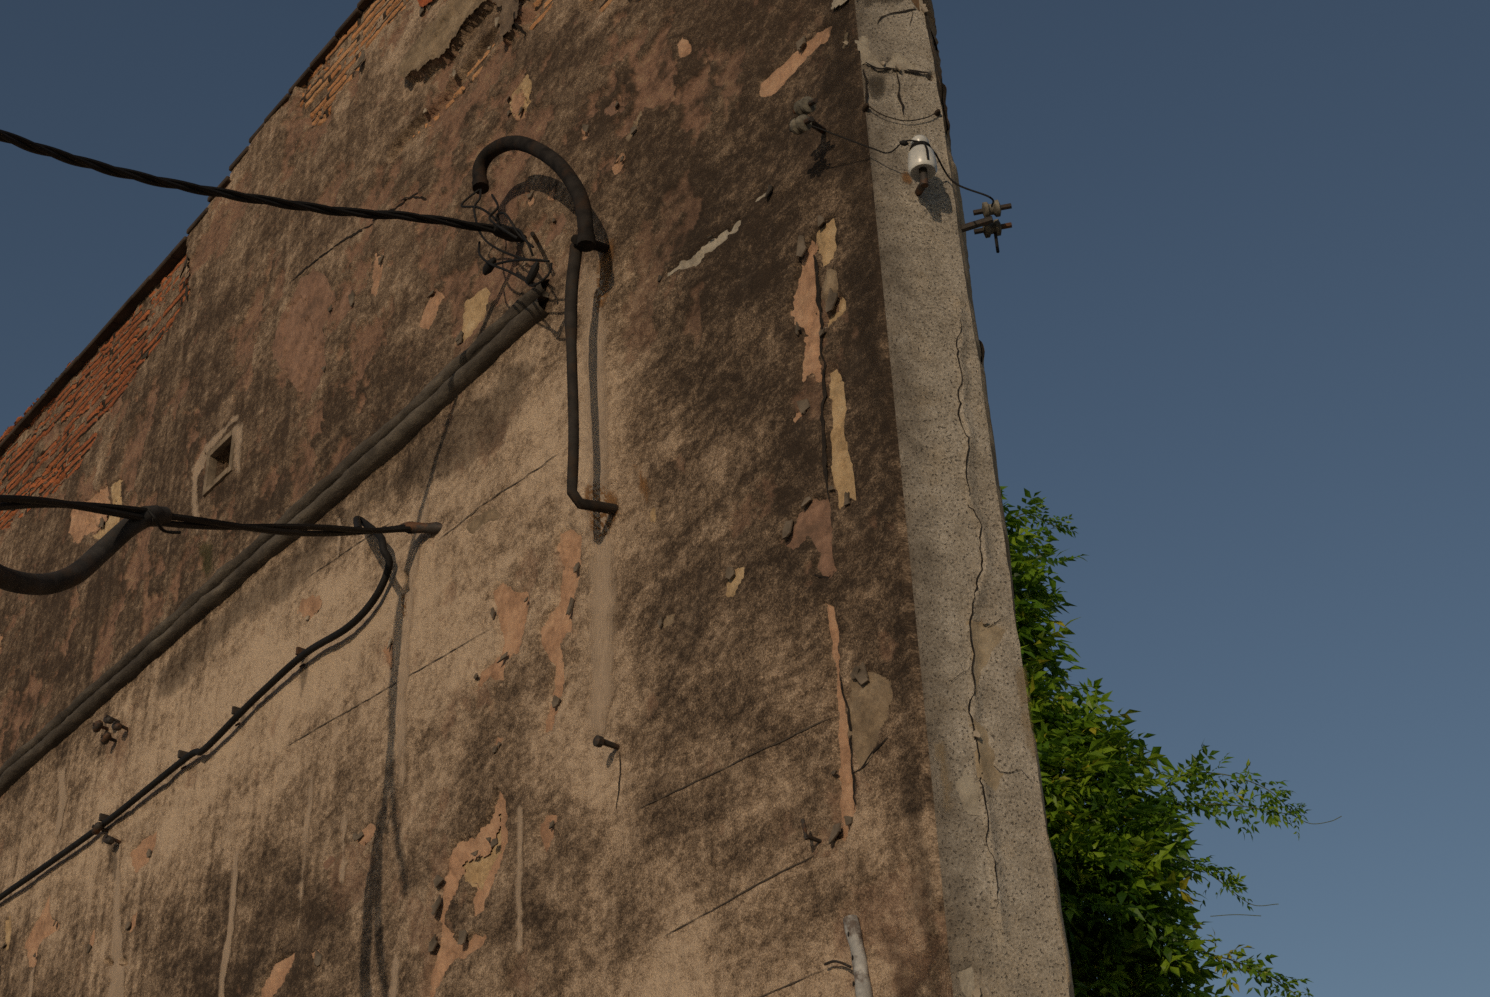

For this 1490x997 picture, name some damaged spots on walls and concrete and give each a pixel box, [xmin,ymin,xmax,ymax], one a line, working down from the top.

peeling [760,0,937,97]
spalling [0,235,191,530]
spalling [780,215,856,579]
peeling [68,480,123,544]
leakage [583,271,615,735]
crack [951,304,1029,916]
leakage [55,767,67,836]
leakage [108,844,128,997]
leakage [219,852,238,997]
leakage [389,955,399,997]
spalling [428,791,508,997]
spalling [827,604,893,844]